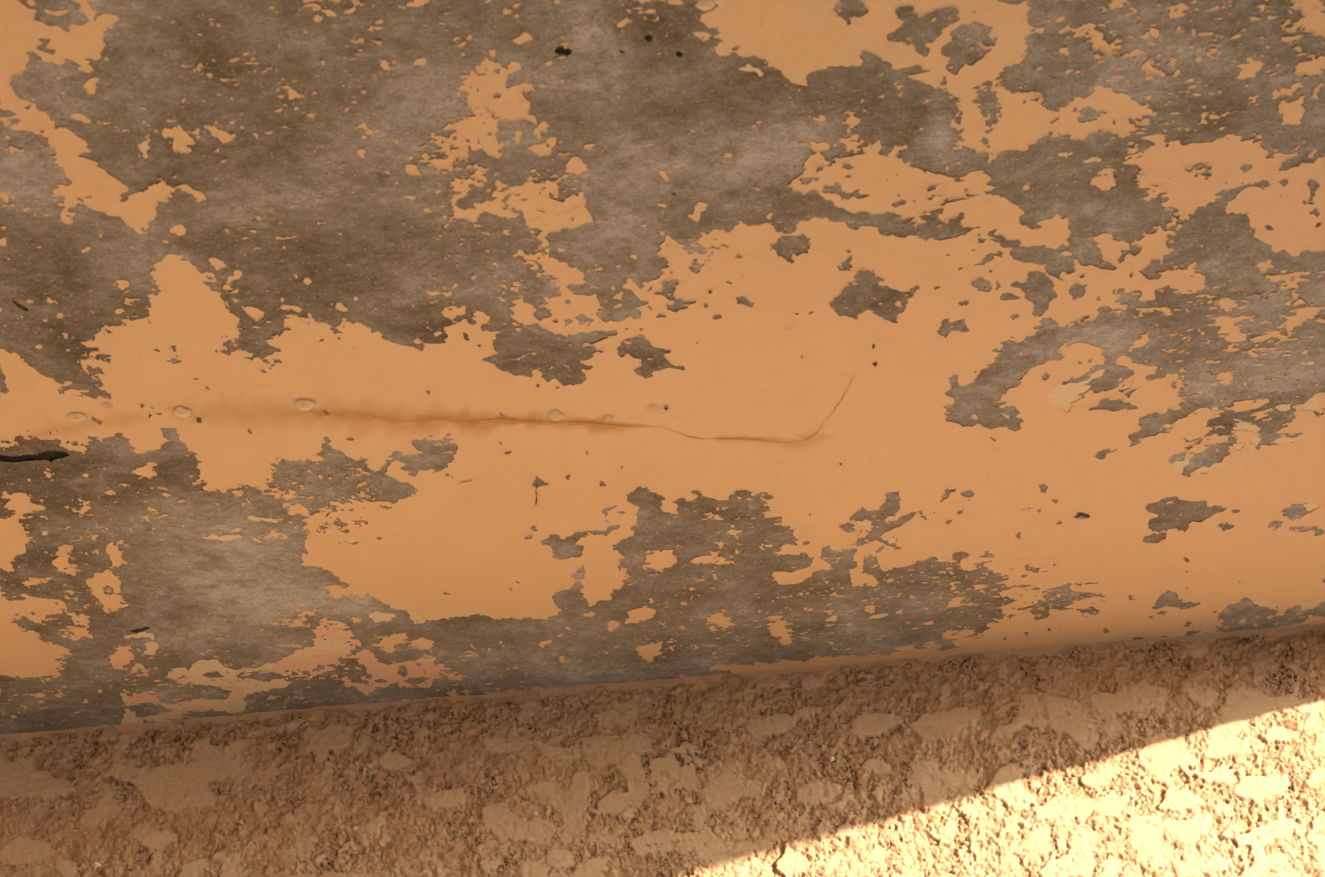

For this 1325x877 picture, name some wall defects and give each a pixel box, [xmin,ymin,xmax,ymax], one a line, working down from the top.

peeling [0,0,1325,477]
crack [631,371,856,444]
peeling [1142,496,1240,543]
peeling [1268,503,1325,535]
peeling [0,404,1109,734]
peeling [1149,590,1325,637]